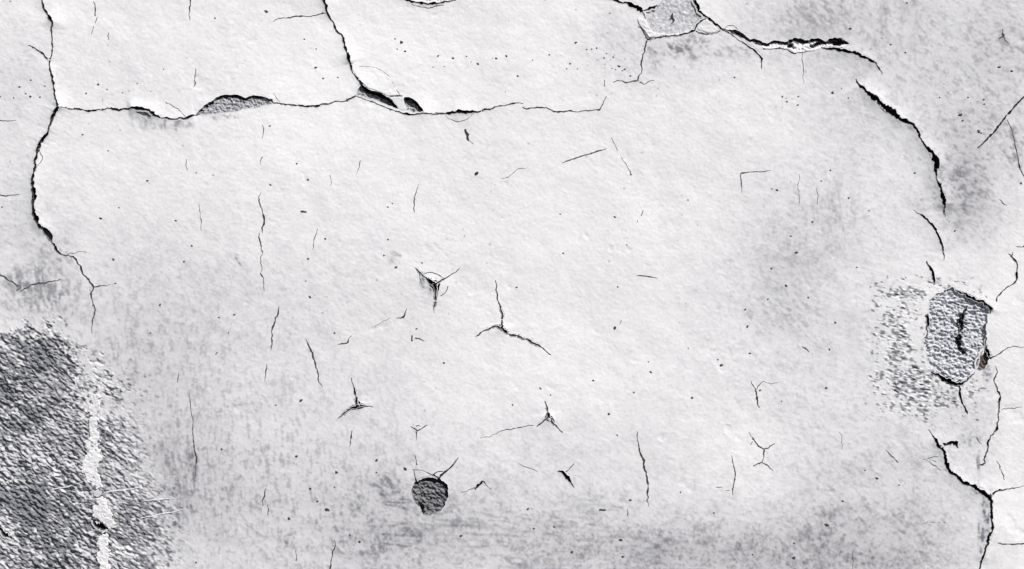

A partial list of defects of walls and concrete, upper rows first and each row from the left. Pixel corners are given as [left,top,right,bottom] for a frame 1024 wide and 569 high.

spalling [638,0,851,53]
spalling [195,94,273,116]
crack [0,0,200,330]
crack [257,193,265,288]
crack [260,0,1024,569]
spalling [921,286,990,383]
peeling [0,310,195,569]